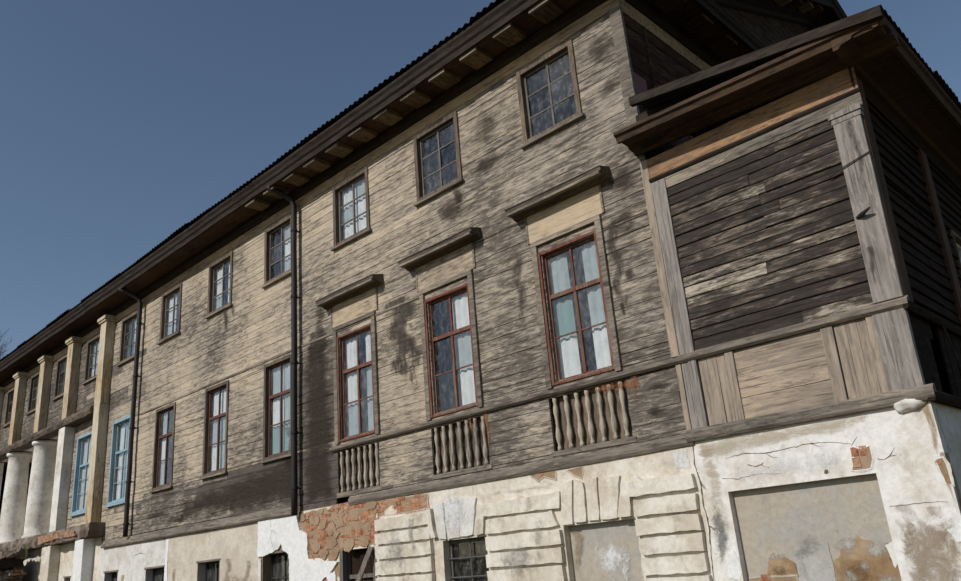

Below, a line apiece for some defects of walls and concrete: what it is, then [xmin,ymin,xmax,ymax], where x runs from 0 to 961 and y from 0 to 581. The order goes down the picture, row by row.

water stain [385,296,419,382]
water stain [150,307,332,523]
flaking render [257,492,430,581]
spalling [728,551,799,581]
crack [693,437,857,578]
flaking render [850,445,875,473]
spalling [834,536,902,581]
flaking render [933,456,955,487]